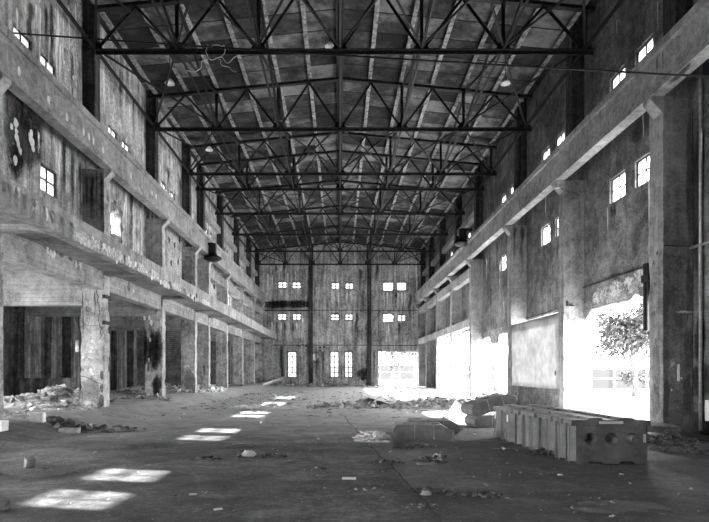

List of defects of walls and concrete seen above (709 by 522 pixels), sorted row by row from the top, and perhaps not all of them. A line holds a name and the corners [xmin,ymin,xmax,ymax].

spalling [585,269,643,321]
flaking render [81,338,104,407]
crack [347,419,436,514]